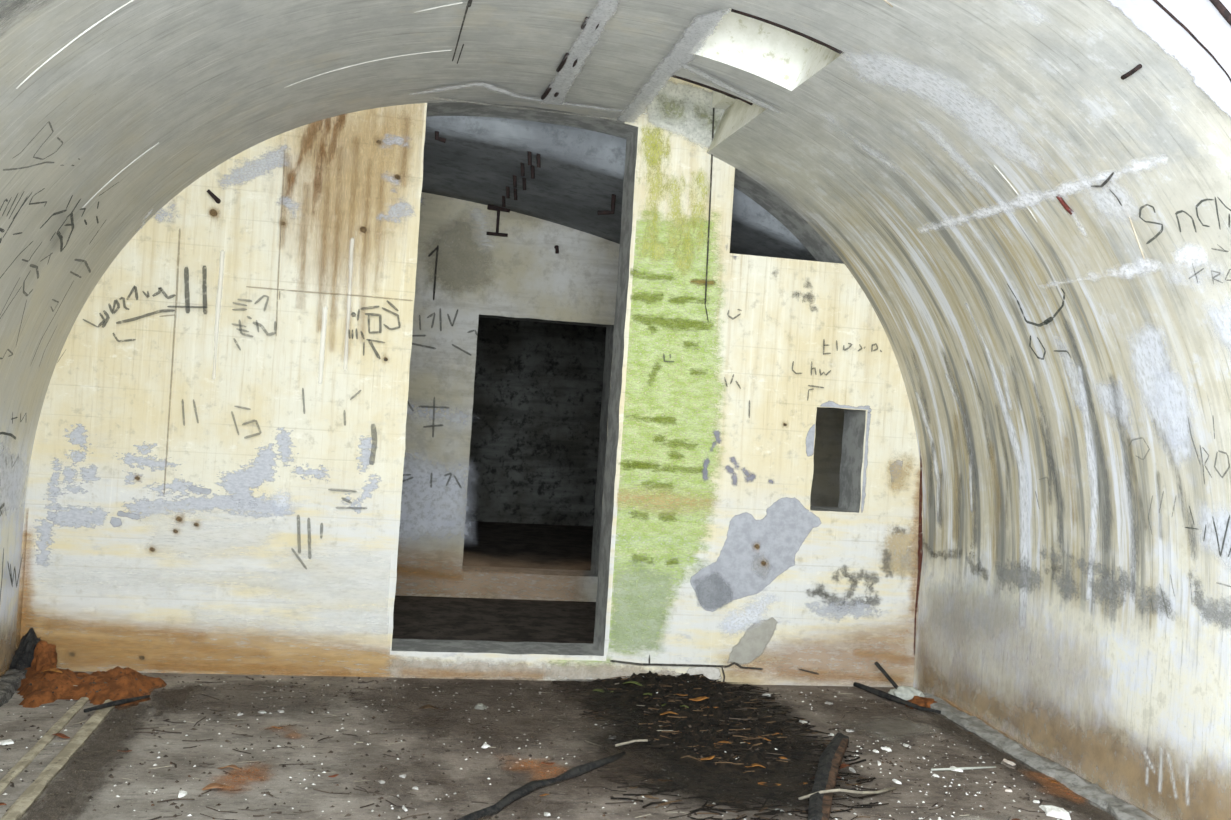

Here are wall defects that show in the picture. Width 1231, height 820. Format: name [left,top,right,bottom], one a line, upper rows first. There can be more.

crack [452,0,473,64]
spalling [1107,0,1231,117]
corrosion [287,114,345,193]
leakage [630,80,725,347]
leakage [1132,328,1190,462]
peeling [33,424,328,567]
peeling [343,436,382,514]
peeling [690,497,821,612]
leakage [806,322,1172,628]
leakage [1179,478,1231,629]
corrosion [0,560,392,677]
peeling [665,618,777,680]